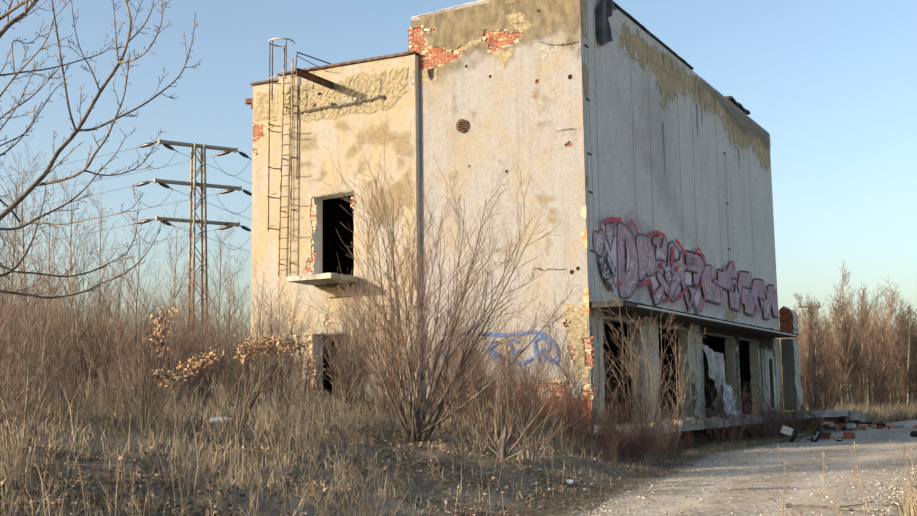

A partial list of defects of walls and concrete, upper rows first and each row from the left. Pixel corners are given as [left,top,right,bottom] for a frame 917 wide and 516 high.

spalling [252,12,533,157]
peeling [617,21,770,175]
spalling [301,198,317,274]
spalling [492,286,600,423]